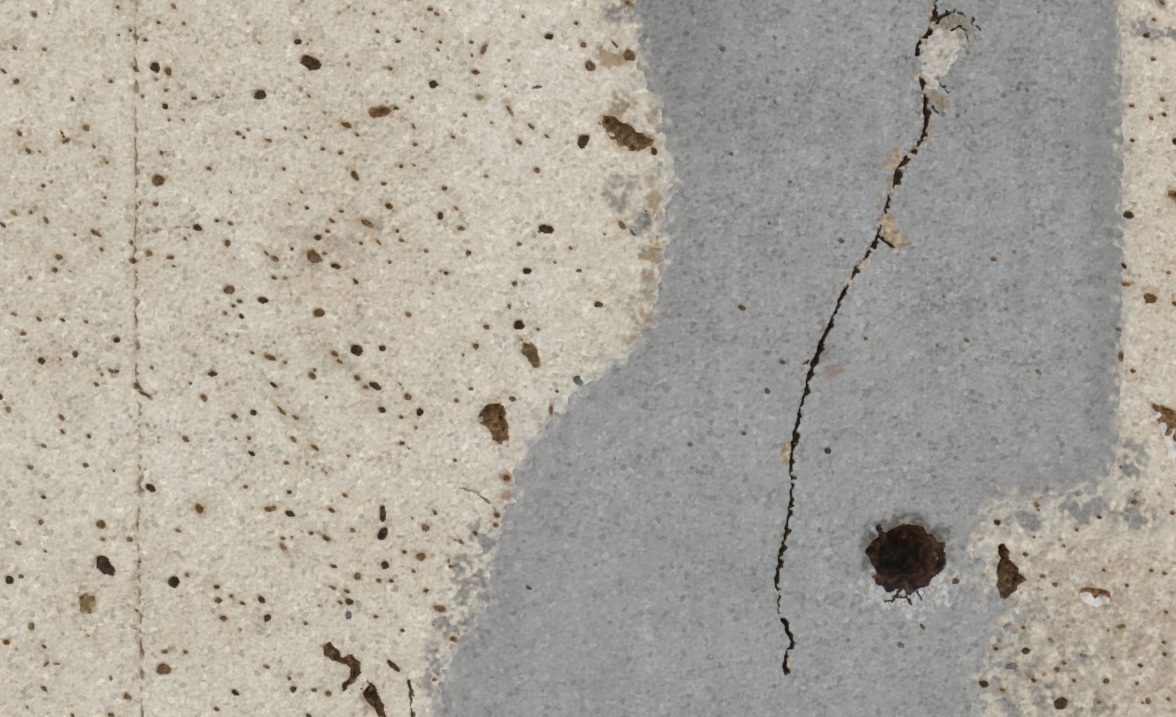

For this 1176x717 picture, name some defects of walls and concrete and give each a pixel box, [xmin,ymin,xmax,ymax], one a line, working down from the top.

crack [774,0,981,675]
spalling [917,17,968,89]